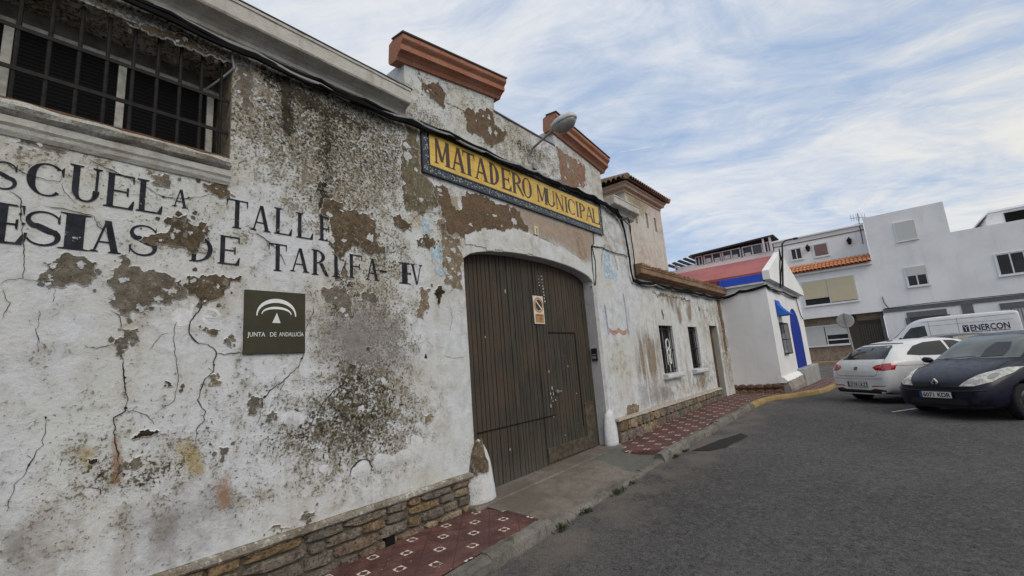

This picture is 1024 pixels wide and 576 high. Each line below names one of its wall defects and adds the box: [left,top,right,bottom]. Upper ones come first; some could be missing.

spalling [36,211,242,359]
mould [248,60,376,221]
spalling [319,194,389,318]
spalling [418,73,446,109]
spalling [390,124,529,320]
spalling [461,104,507,148]
spalling [555,146,587,188]
crack [83,298,240,480]
crack [257,354,304,423]
damp [237,304,406,462]
crack [7,416,47,511]